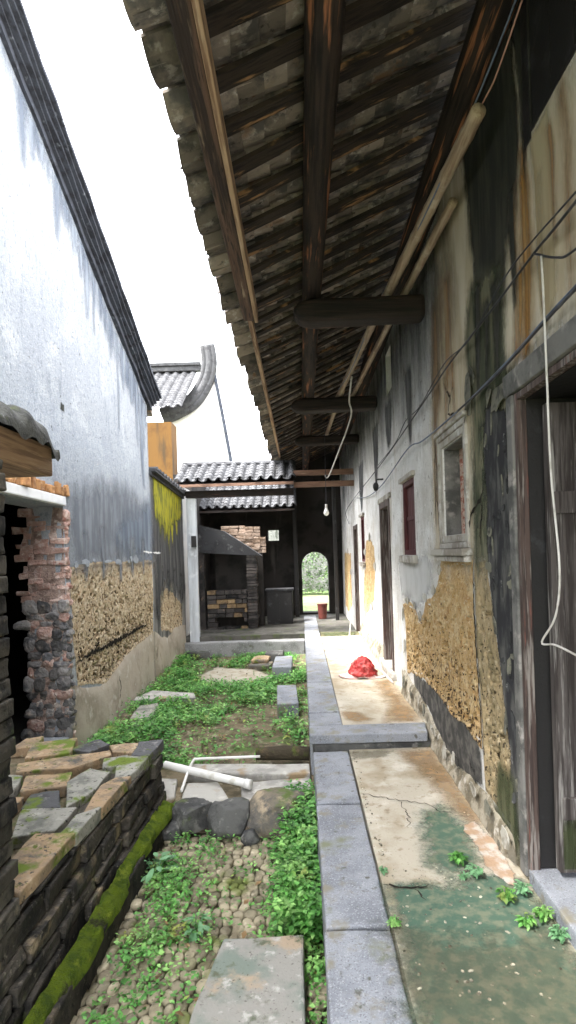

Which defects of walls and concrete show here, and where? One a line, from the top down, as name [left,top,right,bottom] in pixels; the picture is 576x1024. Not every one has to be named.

leakage [18,93,185,623]
flaking render [70,555,183,686]
flaking render [345,533,376,619]
crack [362,793,462,823]
flaking render [402,383,519,835]
leakage [399,3,576,609]